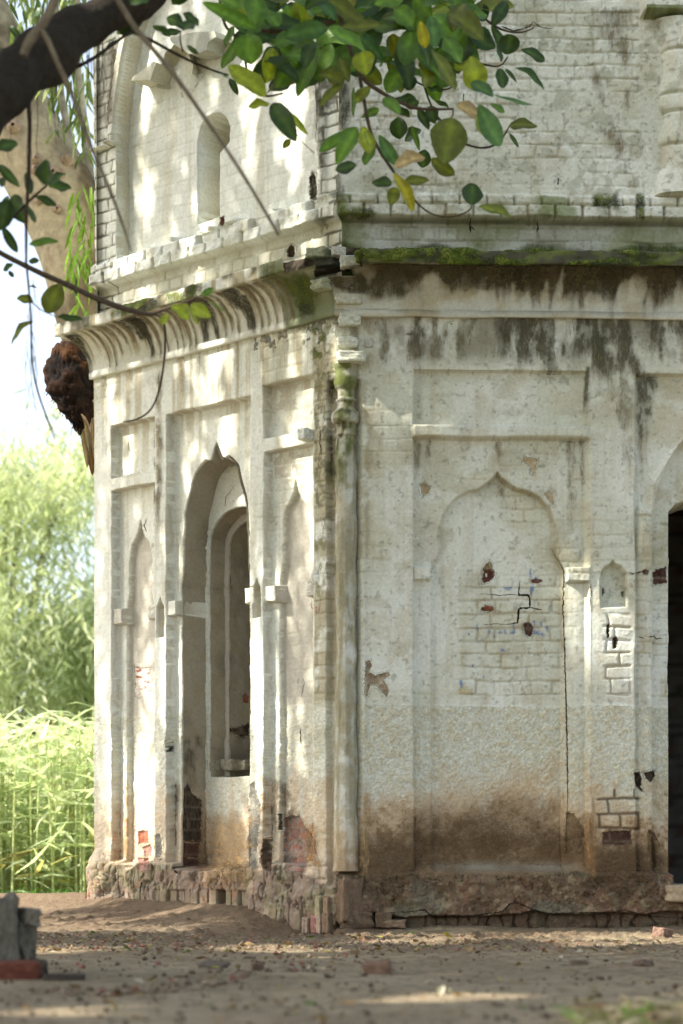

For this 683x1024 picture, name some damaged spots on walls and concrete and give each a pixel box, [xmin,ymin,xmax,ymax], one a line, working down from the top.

damp [330,264,683,306]
damp [408,317,473,356]
damp [650,320,683,357]
damp [497,317,658,440]
spalling [482,560,496,584]
spalling [362,658,390,699]
crack [483,550,569,819]
spalling [632,769,655,791]
spalling [183,782,210,873]
spalling [246,780,317,873]
damp [370,811,574,894]
crack [372,901,676,918]